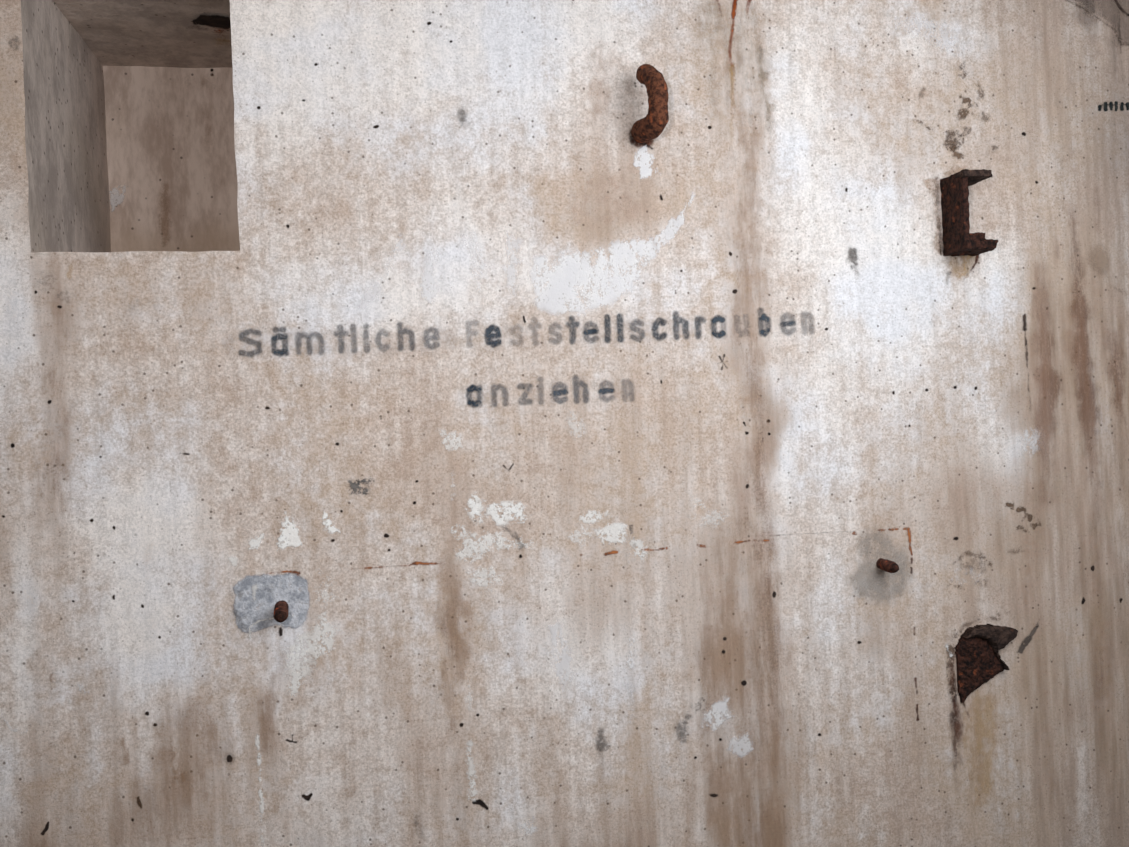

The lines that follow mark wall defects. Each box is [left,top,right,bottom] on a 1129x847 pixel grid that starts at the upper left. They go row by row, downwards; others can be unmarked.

corrosion [729,0,751,79]
corrosion [970,232,985,240]
leakage [1076,300,1095,418]
corrosion [878,528,913,574]